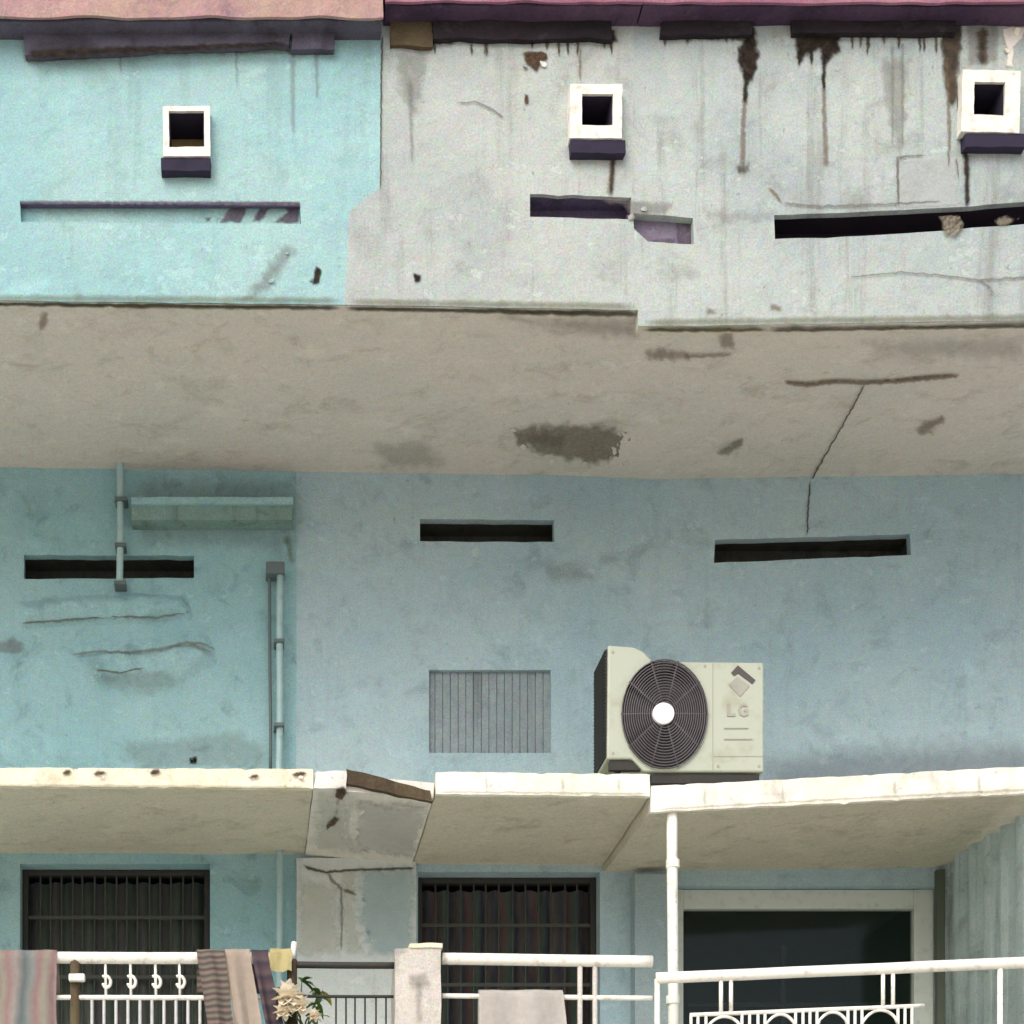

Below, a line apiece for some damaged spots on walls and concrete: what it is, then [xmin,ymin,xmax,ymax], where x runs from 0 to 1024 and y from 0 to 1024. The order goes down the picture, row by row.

spalling [942,216,963,236]
crack [786,375,957,533]
crack [75,641,212,673]
spalling [336,787,347,803]
peeling [354,803,425,858]
crack [305,866,413,948]